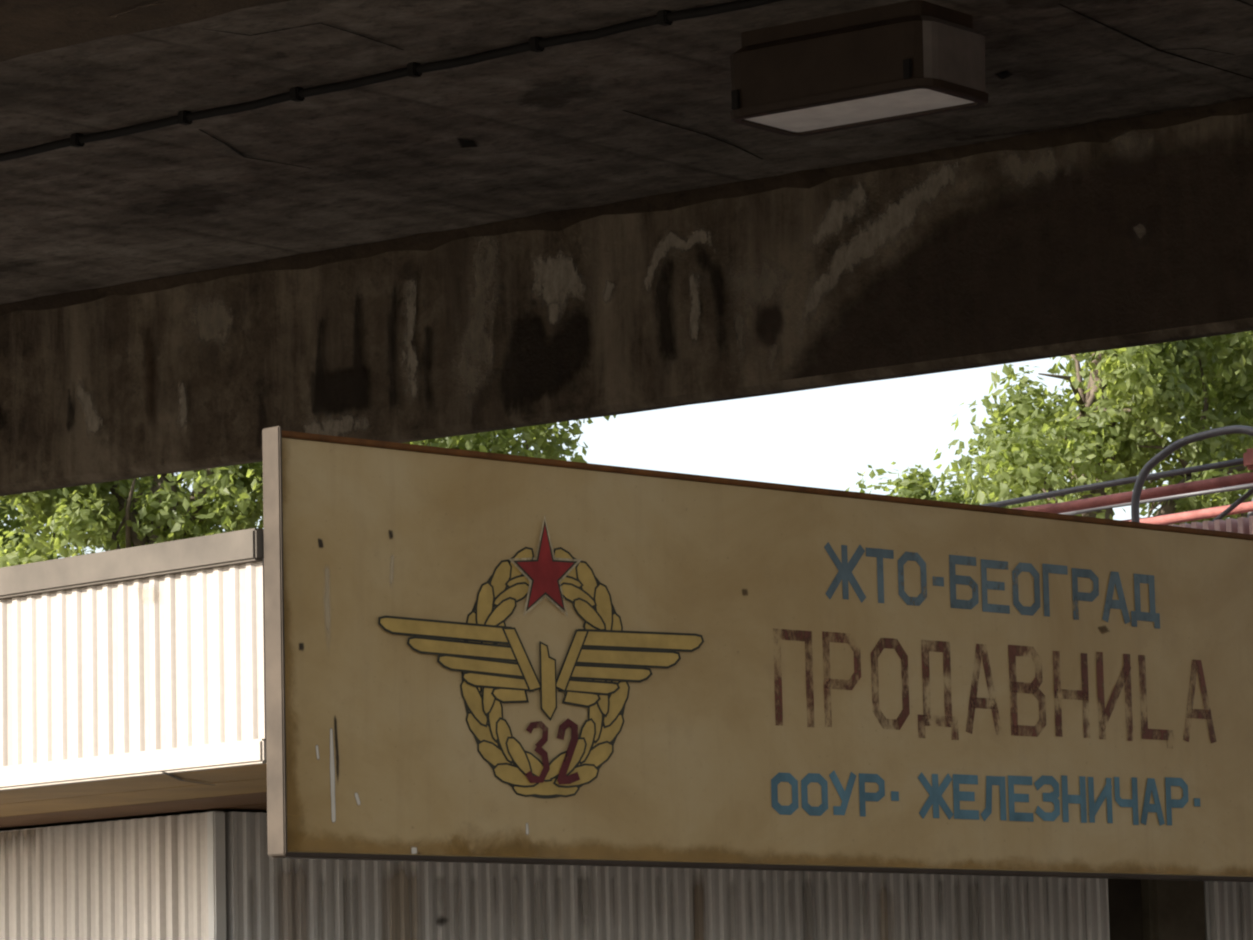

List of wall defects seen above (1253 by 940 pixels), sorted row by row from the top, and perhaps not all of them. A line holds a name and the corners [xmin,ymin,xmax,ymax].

water stain [305,298,369,437]
water stain [387,280,430,406]
water stain [460,236,588,411]